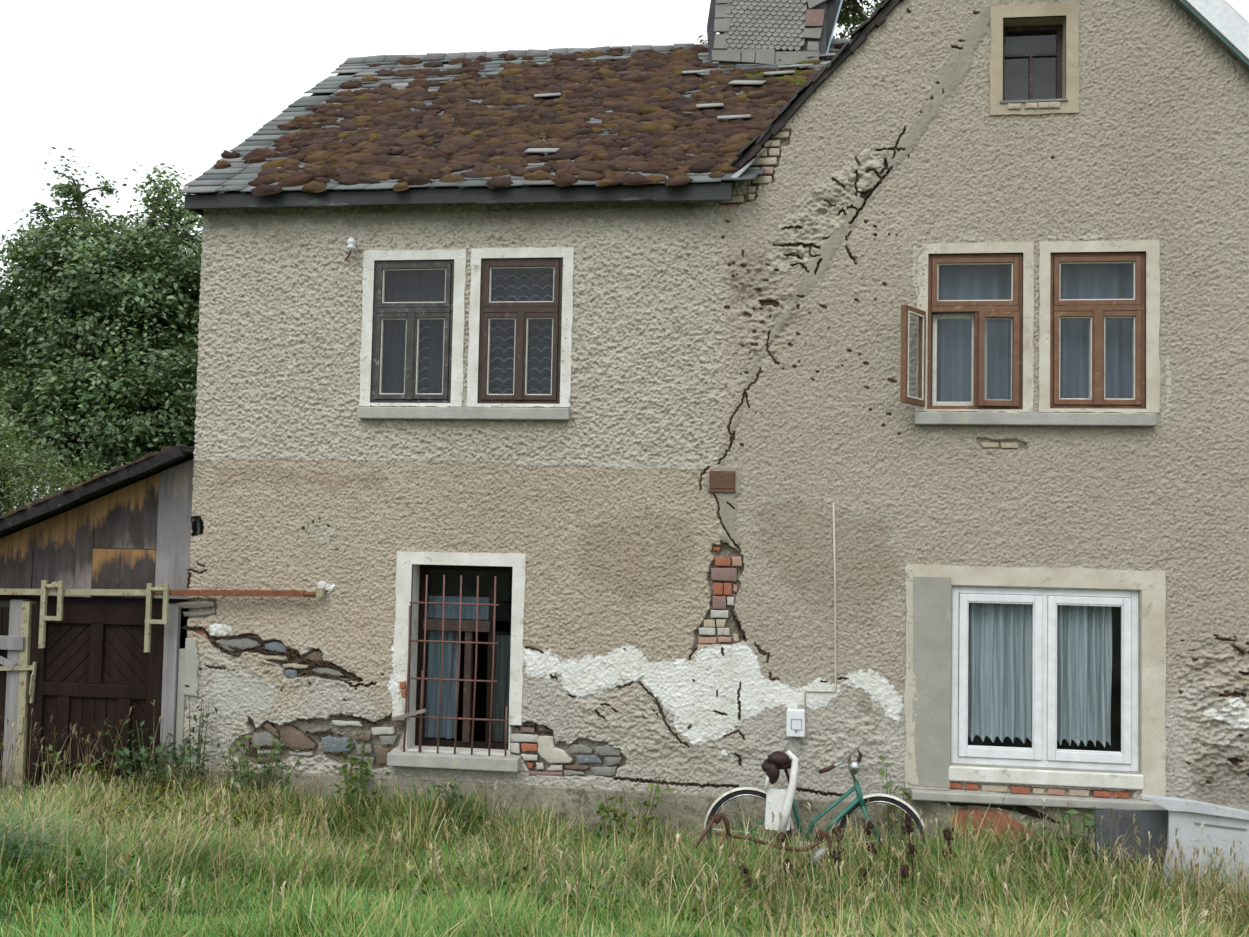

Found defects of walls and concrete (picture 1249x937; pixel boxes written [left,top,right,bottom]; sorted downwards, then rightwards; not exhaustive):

crack [773,126,906,275]
crack [699,331,778,551]
flaking render [693,543,744,649]
spalling [176,598,363,701]
flaking render [233,717,404,769]
flaking render [510,721,627,777]
flaking render [1203,690,1249,737]